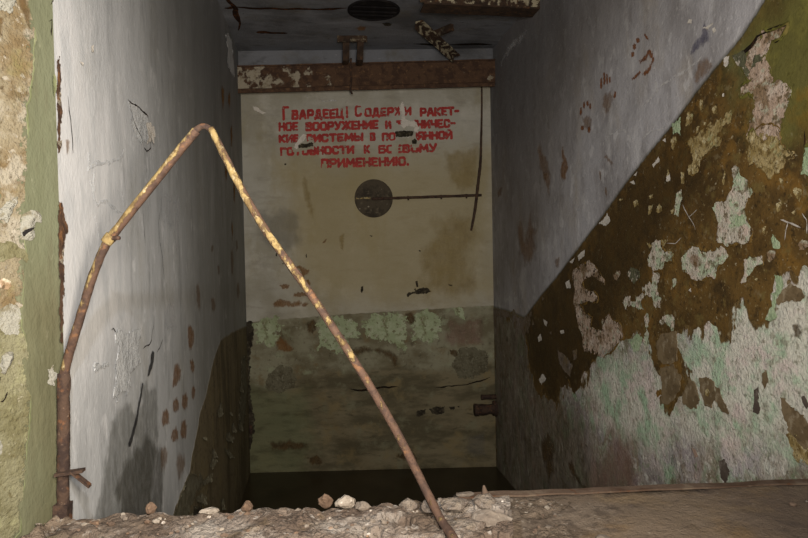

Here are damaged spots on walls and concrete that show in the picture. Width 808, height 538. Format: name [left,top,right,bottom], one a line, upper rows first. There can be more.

crack [225,0,345,34]
peeling [0,0,42,538]
corrosion [58,202,68,344]
peeling [452,21,808,491]
peeling [93,328,141,403]
corrosion [162,386,195,441]
peeling [212,315,285,459]
peeling [174,473,204,516]